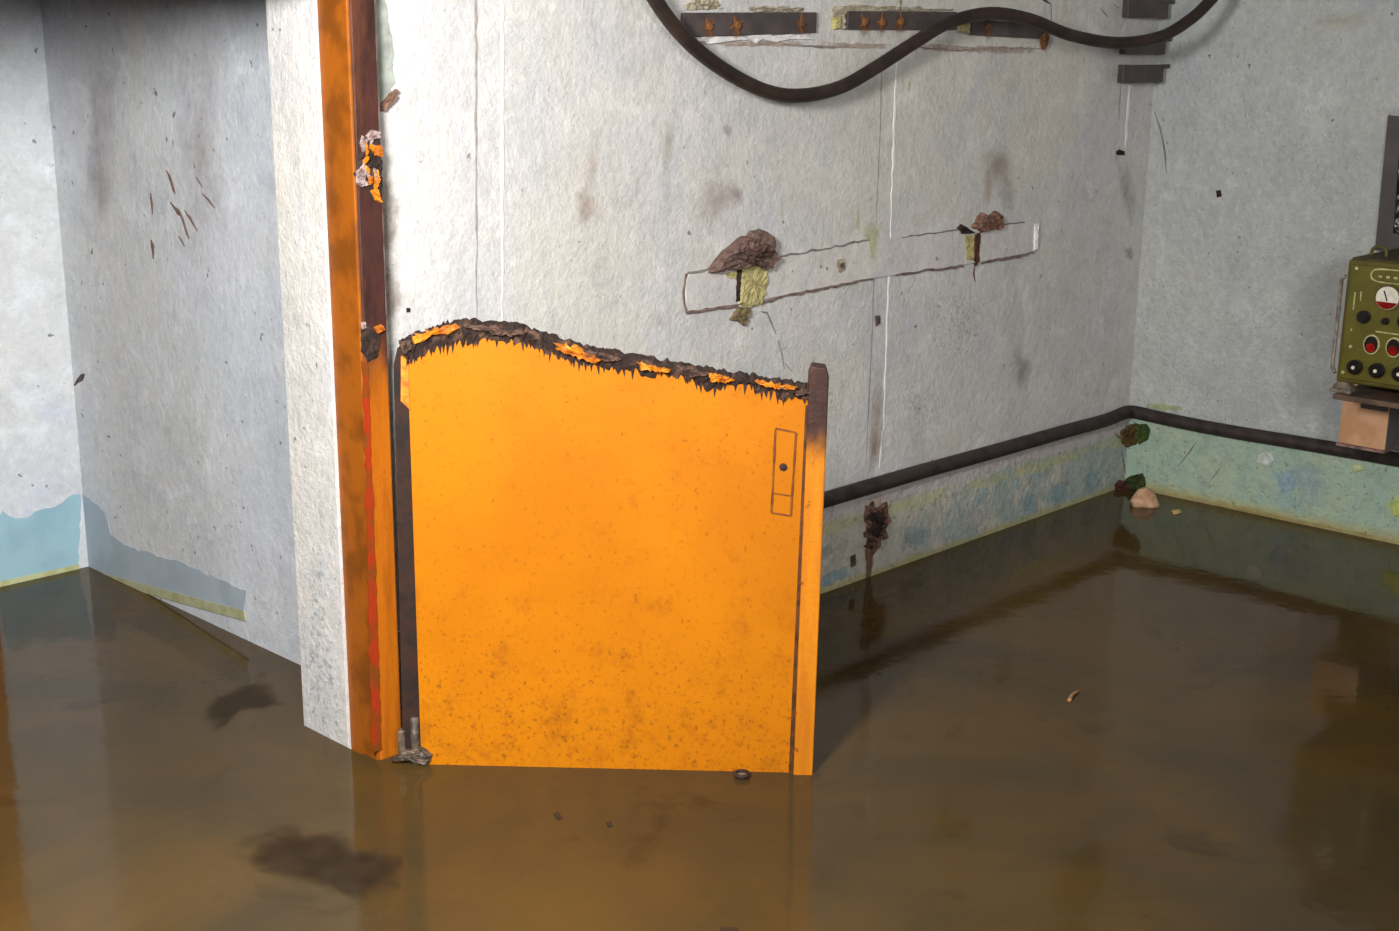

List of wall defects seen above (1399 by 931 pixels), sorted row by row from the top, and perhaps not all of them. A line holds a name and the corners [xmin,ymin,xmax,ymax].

peeling [375,0,399,112]
corrosion [695,13,814,46]
corrosion [837,0,907,48]
corrosion [933,20,1049,54]
spalling [353,130,383,203]
spalling [708,229,781,326]
spalling [957,211,1005,282]